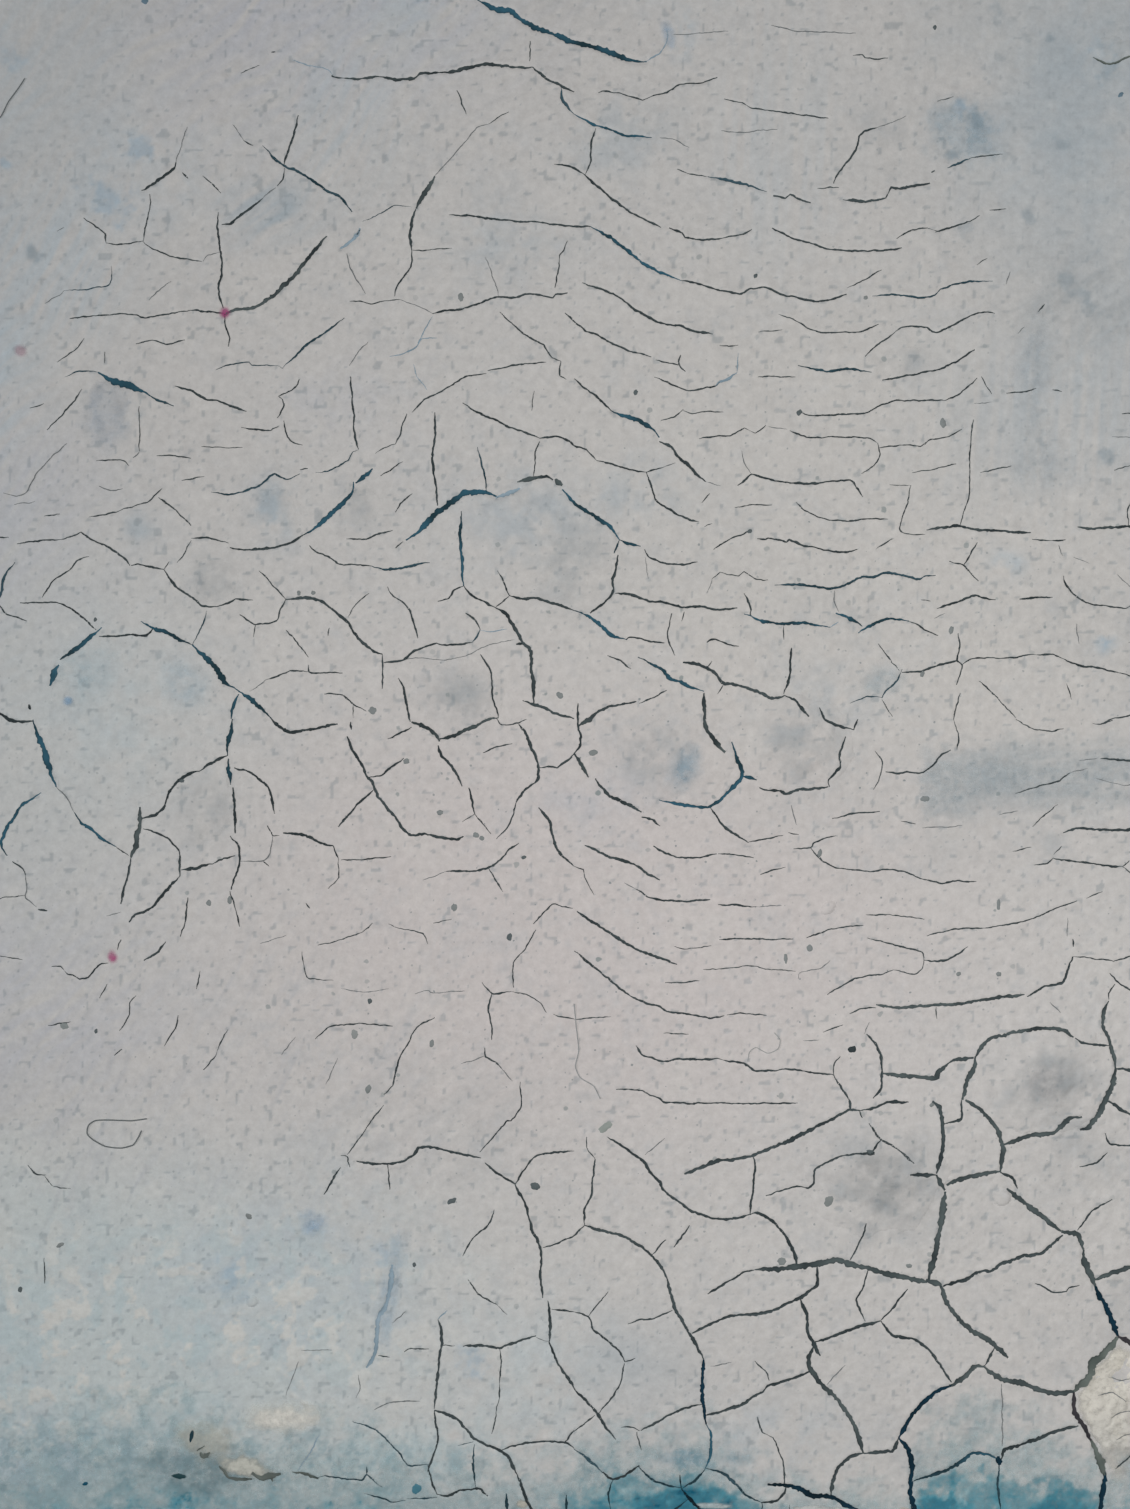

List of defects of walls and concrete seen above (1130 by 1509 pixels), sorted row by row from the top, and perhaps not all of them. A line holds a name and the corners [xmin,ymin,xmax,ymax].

crack [164,973,200,1046]
crack [282,892,1130,1509]
peeling [181,1428,319,1482]
peeling [1079,1348,1130,1471]